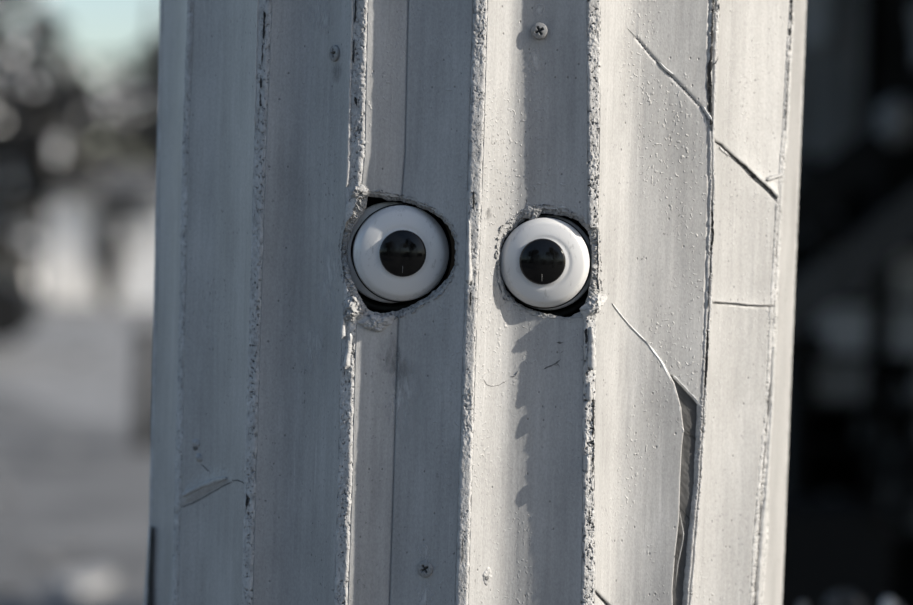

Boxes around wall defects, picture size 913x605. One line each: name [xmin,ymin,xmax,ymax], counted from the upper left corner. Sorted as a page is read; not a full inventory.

crack [628,0,783,200]
crack [704,200,773,394]